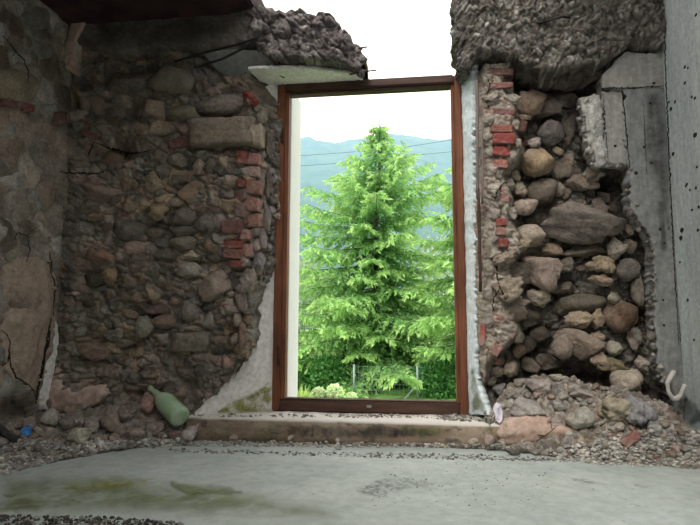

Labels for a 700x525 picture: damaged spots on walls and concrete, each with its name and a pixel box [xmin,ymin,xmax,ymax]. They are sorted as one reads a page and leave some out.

crack [60,142,150,178]
spalling [576,98,633,172]
crack [1,251,58,404]
peeling [38,321,110,414]
peeling [191,154,278,416]
peeling [461,65,493,415]
spalling [623,186,669,388]
damp [65,482,246,507]